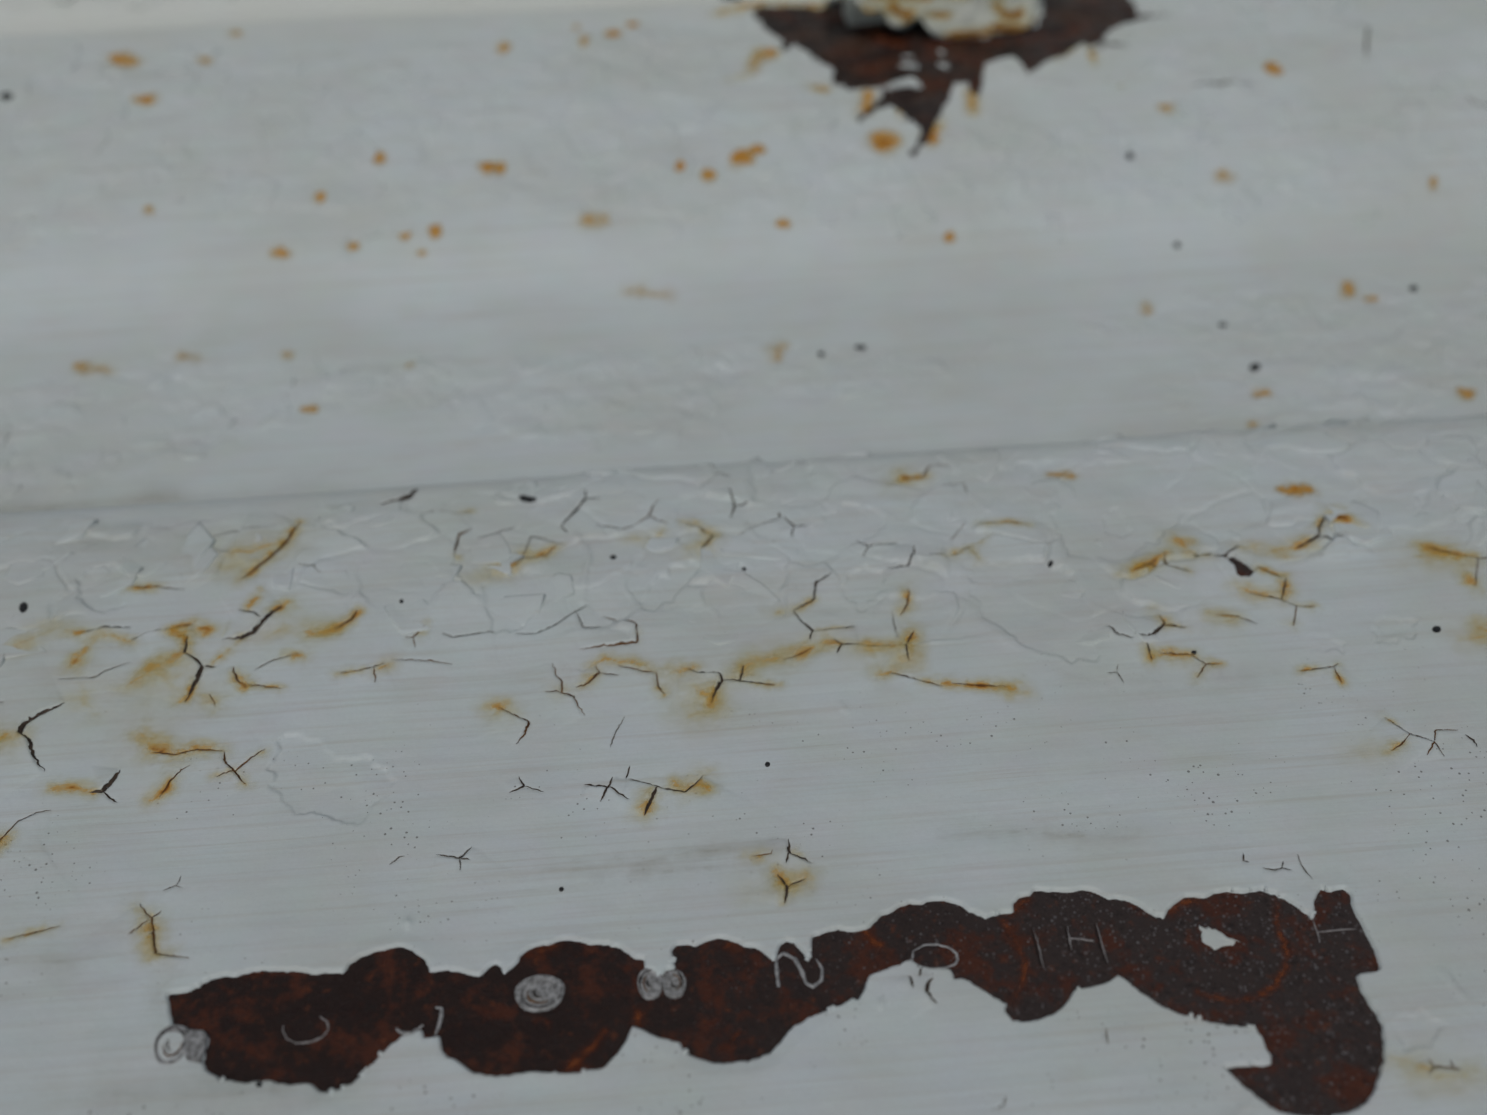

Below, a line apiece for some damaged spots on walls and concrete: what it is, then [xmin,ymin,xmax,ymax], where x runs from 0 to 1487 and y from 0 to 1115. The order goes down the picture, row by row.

peeling [752,0,1155,163]
corrosion [731,145,765,164]
corrosion [871,131,901,153]
corrosion [1289,514,1352,550]
crack [17,522,319,771]
corrosion [136,622,213,680]
crack [341,465,1020,815]
corrosion [926,681,1016,690]
crack [89,770,120,802]
crack [154,749,263,797]
crack [756,839,811,902]
peeling [169,886,1383,1115]